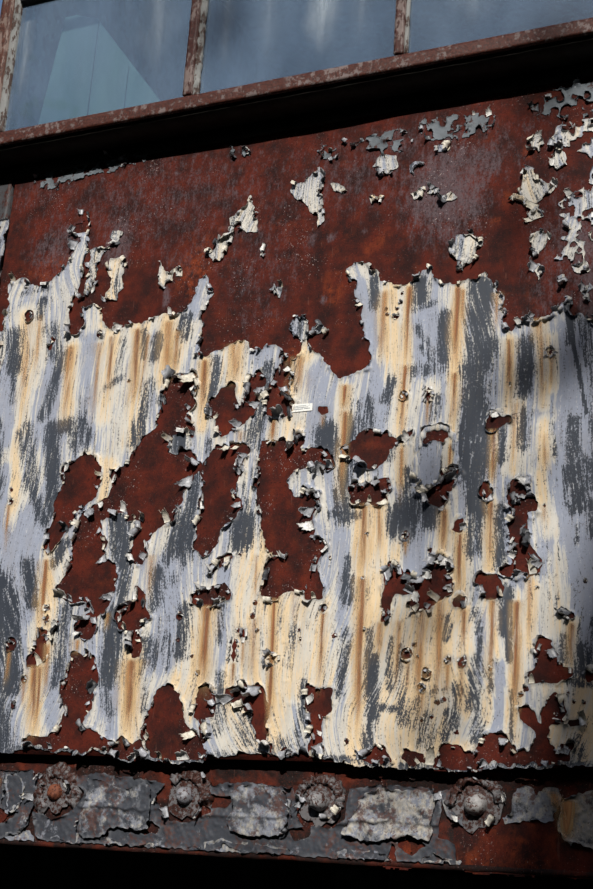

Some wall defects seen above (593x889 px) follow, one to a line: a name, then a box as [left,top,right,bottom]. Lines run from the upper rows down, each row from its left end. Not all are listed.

rust [382,288,411,336]
rust [452,288,464,346]
peeling [0,76,593,658]
peeling [26,619,59,668]
peeling [0,637,593,880]